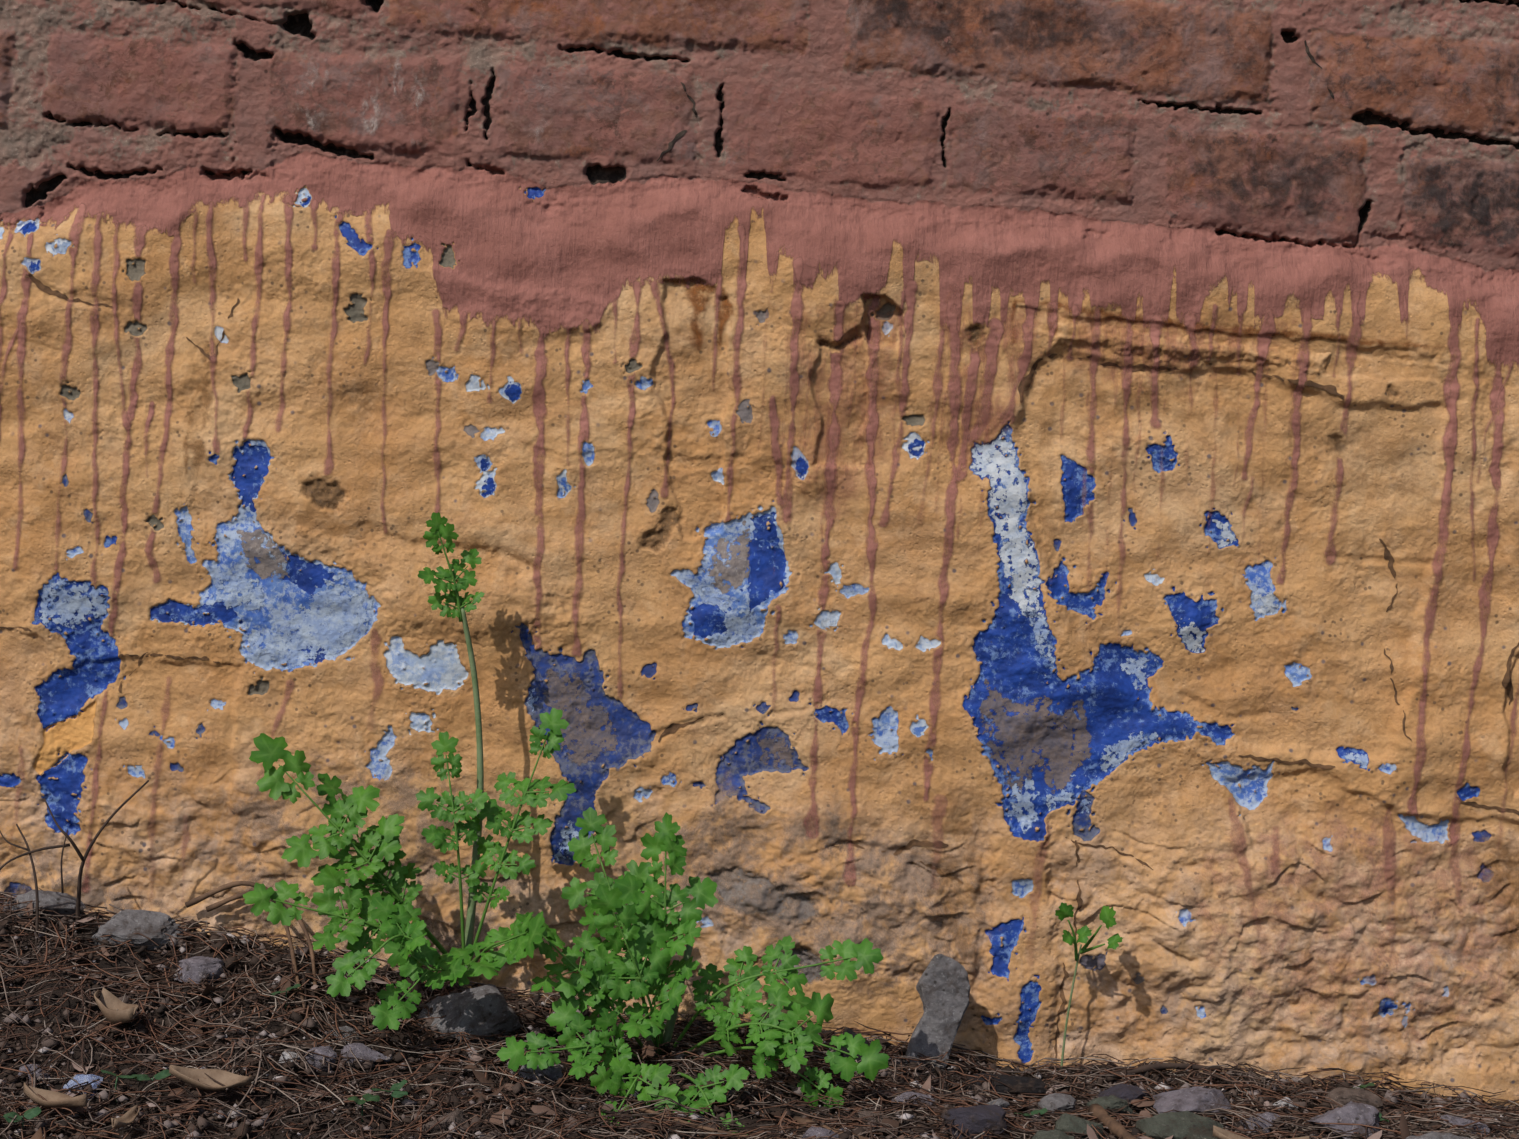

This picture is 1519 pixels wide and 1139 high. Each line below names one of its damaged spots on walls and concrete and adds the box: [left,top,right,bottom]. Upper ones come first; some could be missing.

peeling [0,752,88,835]
peeling [32,546,129,731]
peeling [150,439,381,672]
peeling [366,636,469,781]
peeling [511,623,657,867]
peeling [633,702,809,814]
peeling [671,500,792,650]
peeling [789,690,853,735]
peeling [783,562,869,644]
peeling [868,706,933,761]
peeling [962,421,1280,842]
peeling [1242,557,1287,621]